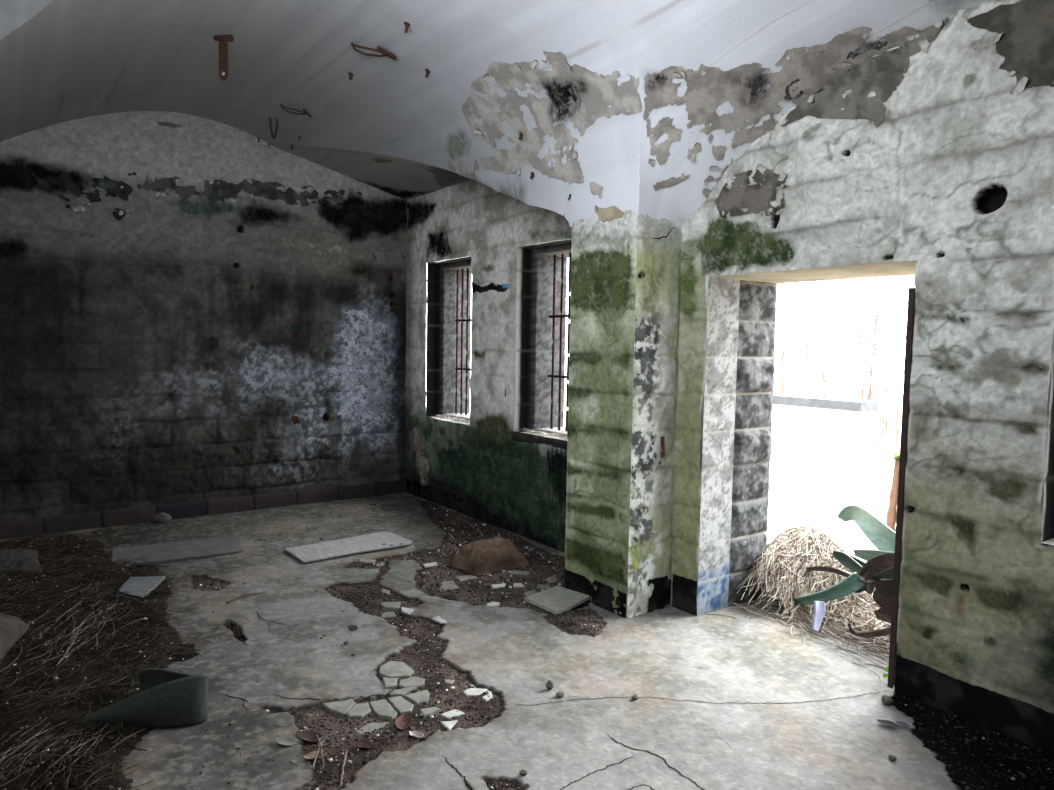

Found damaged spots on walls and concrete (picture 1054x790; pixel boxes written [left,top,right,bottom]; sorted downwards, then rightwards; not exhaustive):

flaking render [448,18,948,228]